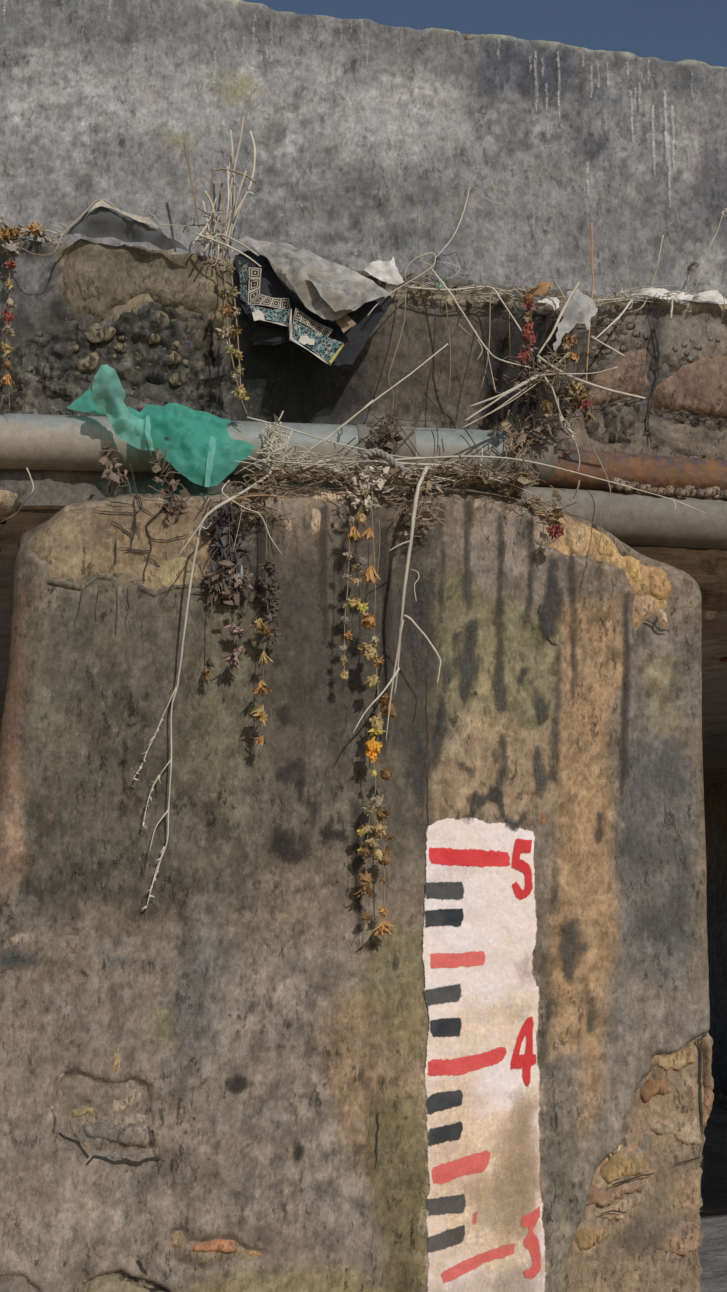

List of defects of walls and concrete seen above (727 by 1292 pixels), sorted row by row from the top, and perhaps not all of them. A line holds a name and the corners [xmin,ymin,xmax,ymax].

spalling [0,490,24,530]
flaking render [27,499,218,597]
leakage [252,500,481,800]
leakage [493,515,559,795]
leakage [529,518,577,693]
flaking render [534,510,672,631]
leakage [620,592,677,793]
leakage [269,759,363,931]
leakage [464,733,526,830]
spalling [51,1049,156,1153]
spalling [566,1033,714,1292]
spalling [77,1272,165,1292]